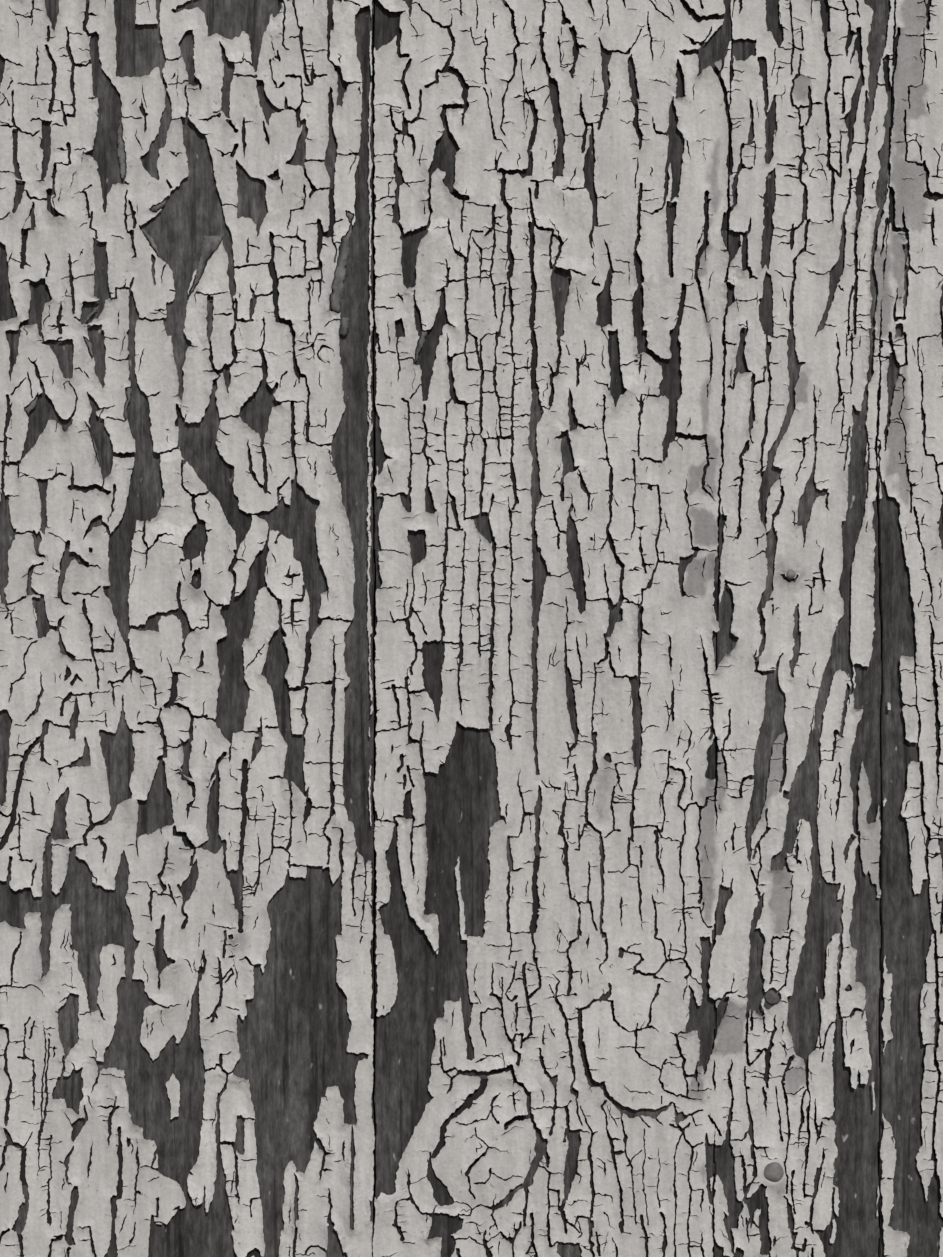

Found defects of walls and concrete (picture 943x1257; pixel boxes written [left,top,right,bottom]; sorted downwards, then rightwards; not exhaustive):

peeling [273,236,305,278]
peeling [466,231,509,371]
peeling [495,306,514,407]
peeling [410,413,426,453]
peeling [481,371,512,438]
crack [0,0,421,1090]
peeling [445,435,515,646]
crack [195,0,943,1257]
peeling [661,768,684,842]
peeling [772,938,789,973]
peeling [660,1063,686,1096]
peeling [615,1153,635,1216]